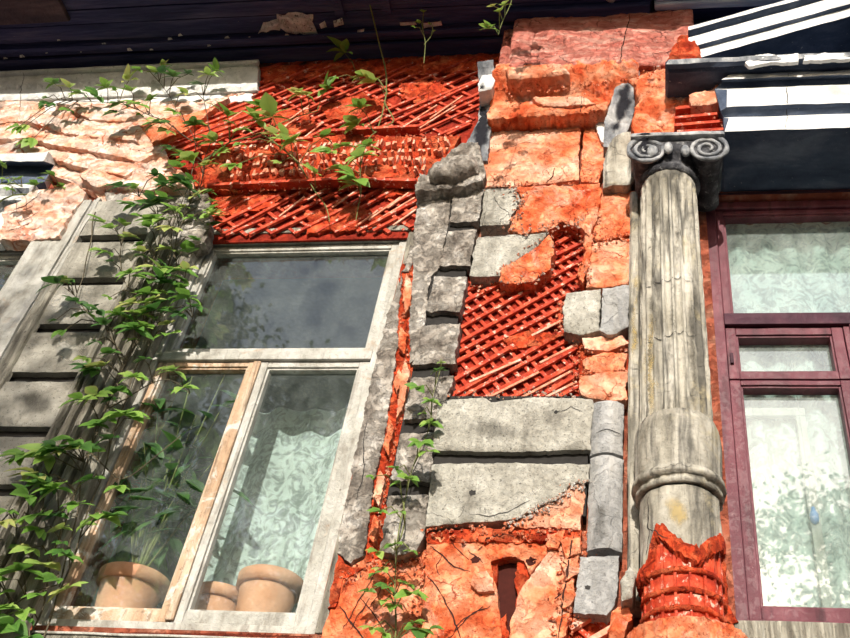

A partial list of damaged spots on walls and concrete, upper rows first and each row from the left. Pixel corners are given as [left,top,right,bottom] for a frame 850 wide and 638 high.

peeling [258,12,344,36]
spalling [0,35,723,410]
crack [427,500,530,638]
spalling [321,477,748,638]